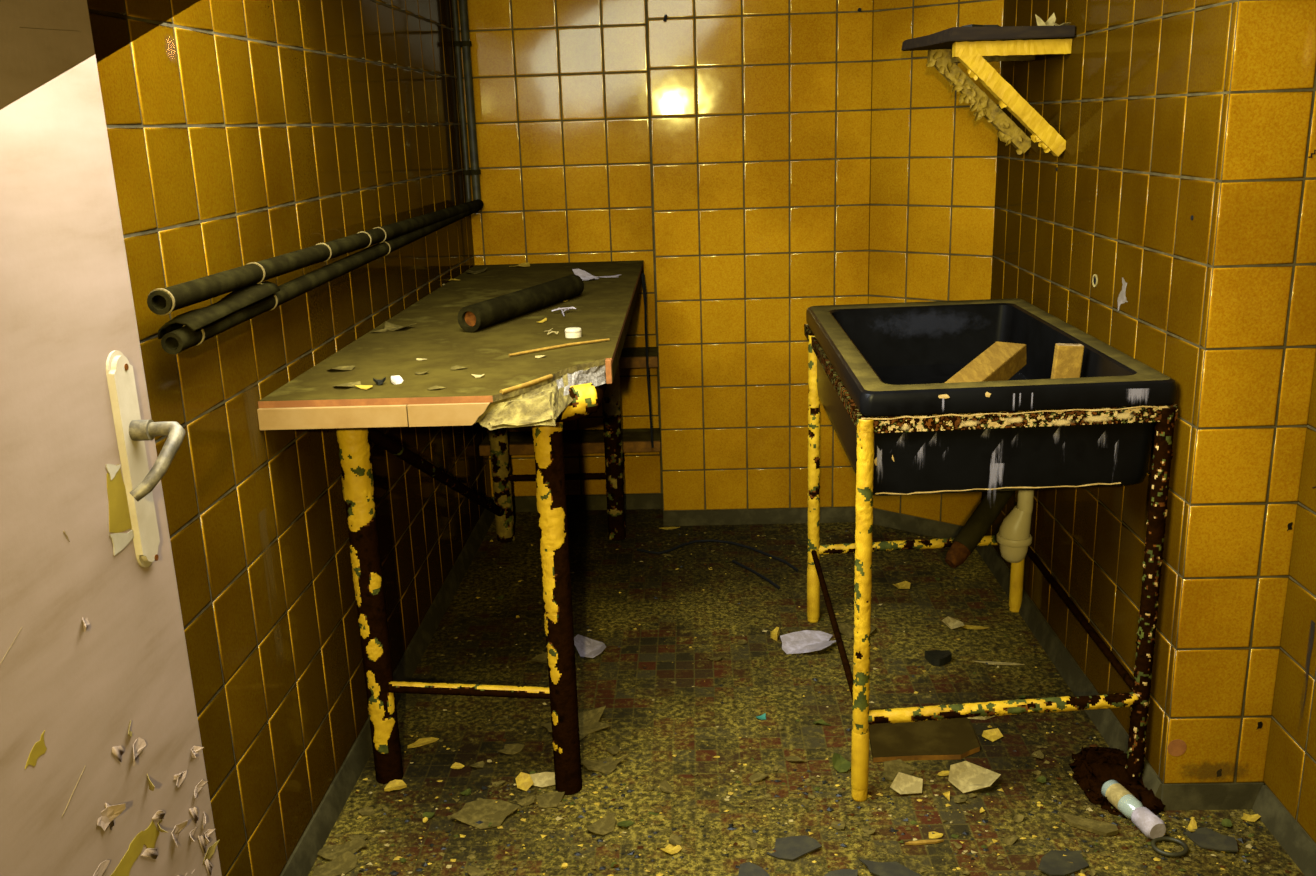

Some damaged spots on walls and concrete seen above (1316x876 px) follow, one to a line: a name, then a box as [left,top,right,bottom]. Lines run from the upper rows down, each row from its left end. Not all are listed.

peeling [25,730,47,769]
peeling [110,821,160,876]